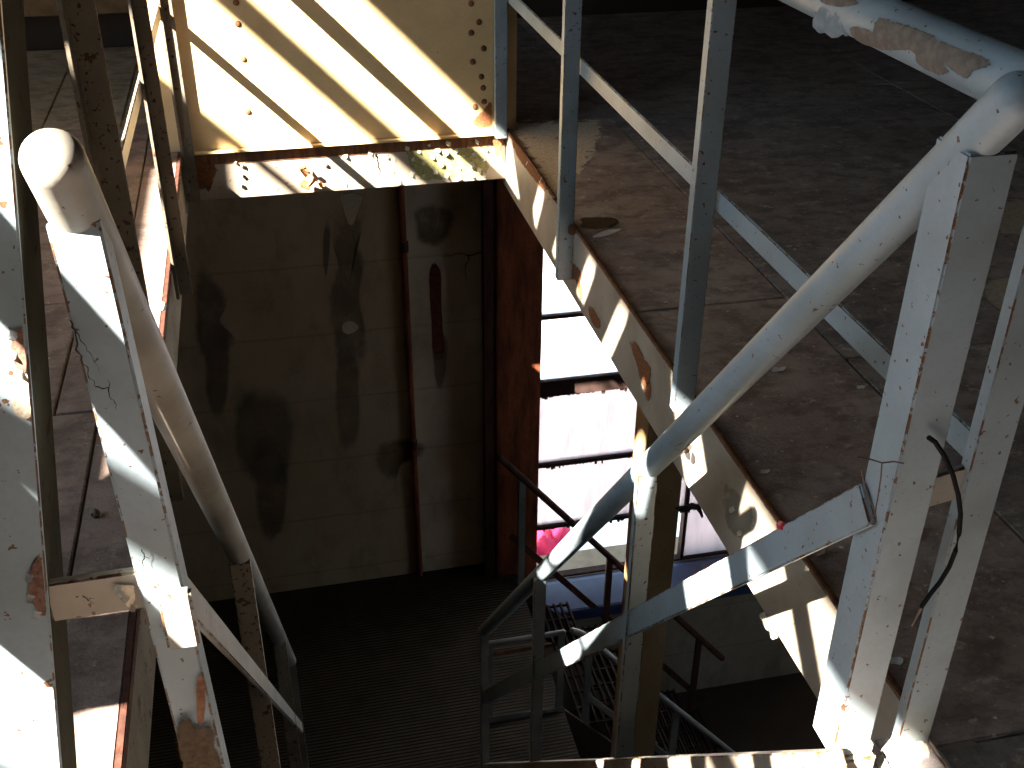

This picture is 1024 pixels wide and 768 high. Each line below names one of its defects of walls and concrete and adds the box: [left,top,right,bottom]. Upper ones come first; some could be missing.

peeling [812,0,991,78]
corrosion [194,102,505,192]
peeling [5,327,31,419]
crack [70,320,117,410]
leakage [197,276,233,414]
leakage [323,222,364,445]
corrosion [429,264,444,354]
corrosion [630,342,651,401]
leakage [237,395,291,536]
peeling [25,557,46,620]